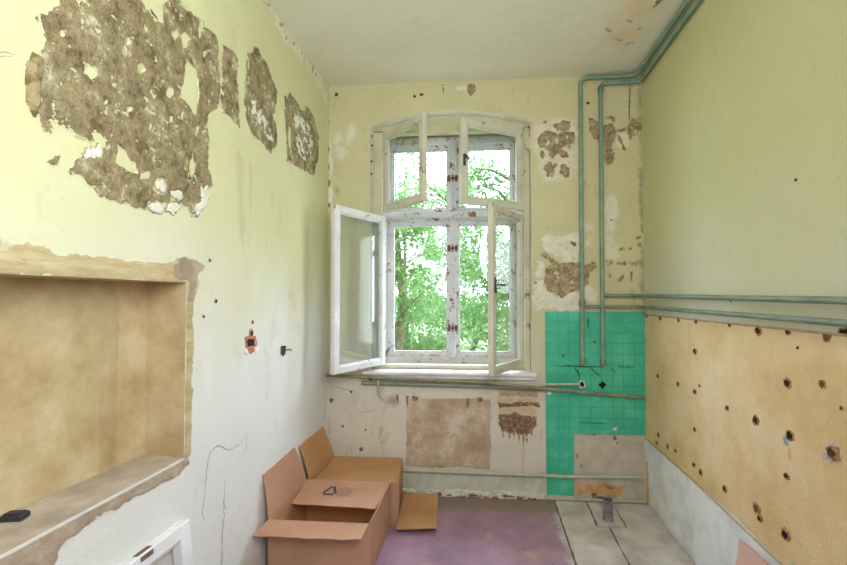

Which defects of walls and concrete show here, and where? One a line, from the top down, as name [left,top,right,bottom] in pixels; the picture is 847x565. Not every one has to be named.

flaking render [25,0,319,218]
peeling [525,111,643,189]
peeling [531,190,644,312]
crack [202,433,247,565]